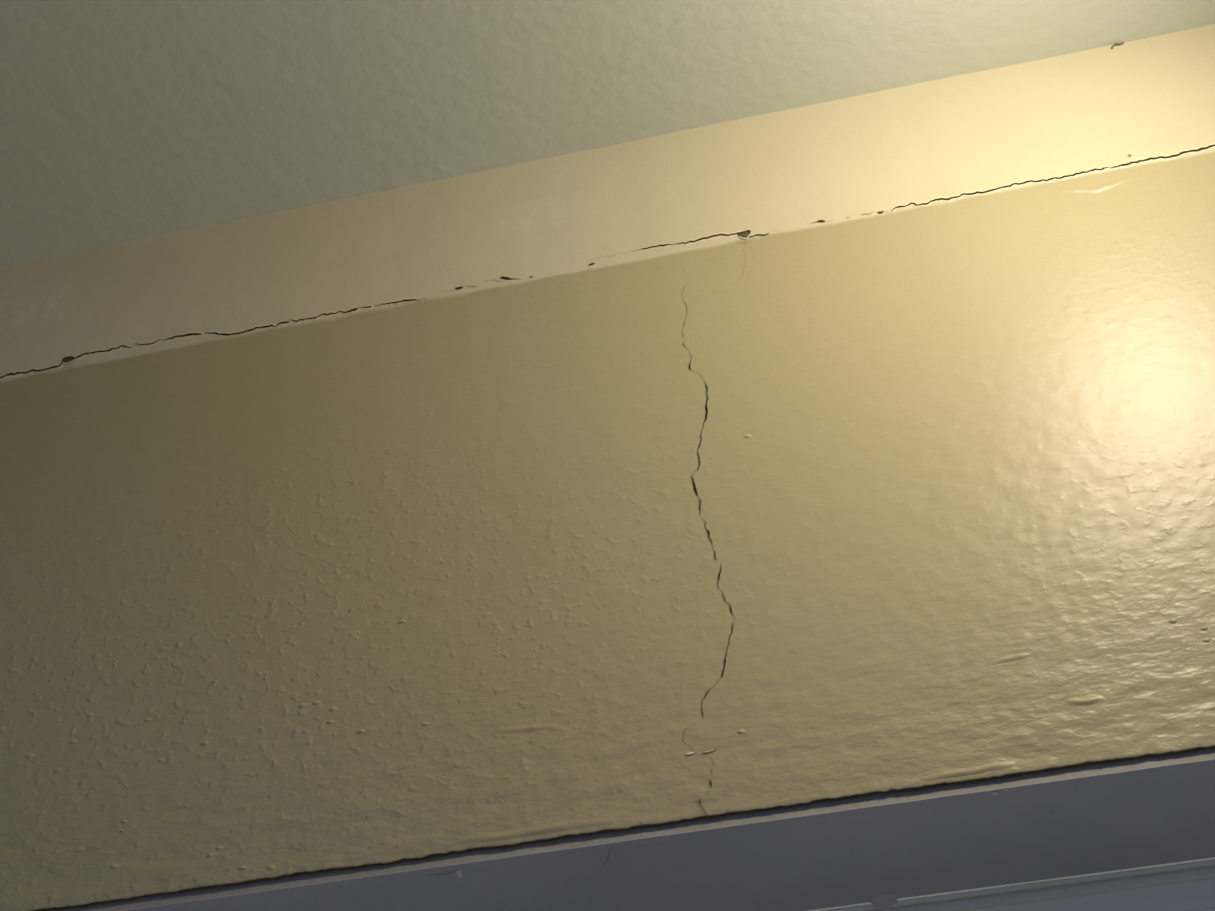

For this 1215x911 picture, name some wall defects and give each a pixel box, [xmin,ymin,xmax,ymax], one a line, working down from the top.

crack [862,143,1215,215]
crack [639,230,769,251]
crack [0,297,428,380]
crack [683,343,733,715]